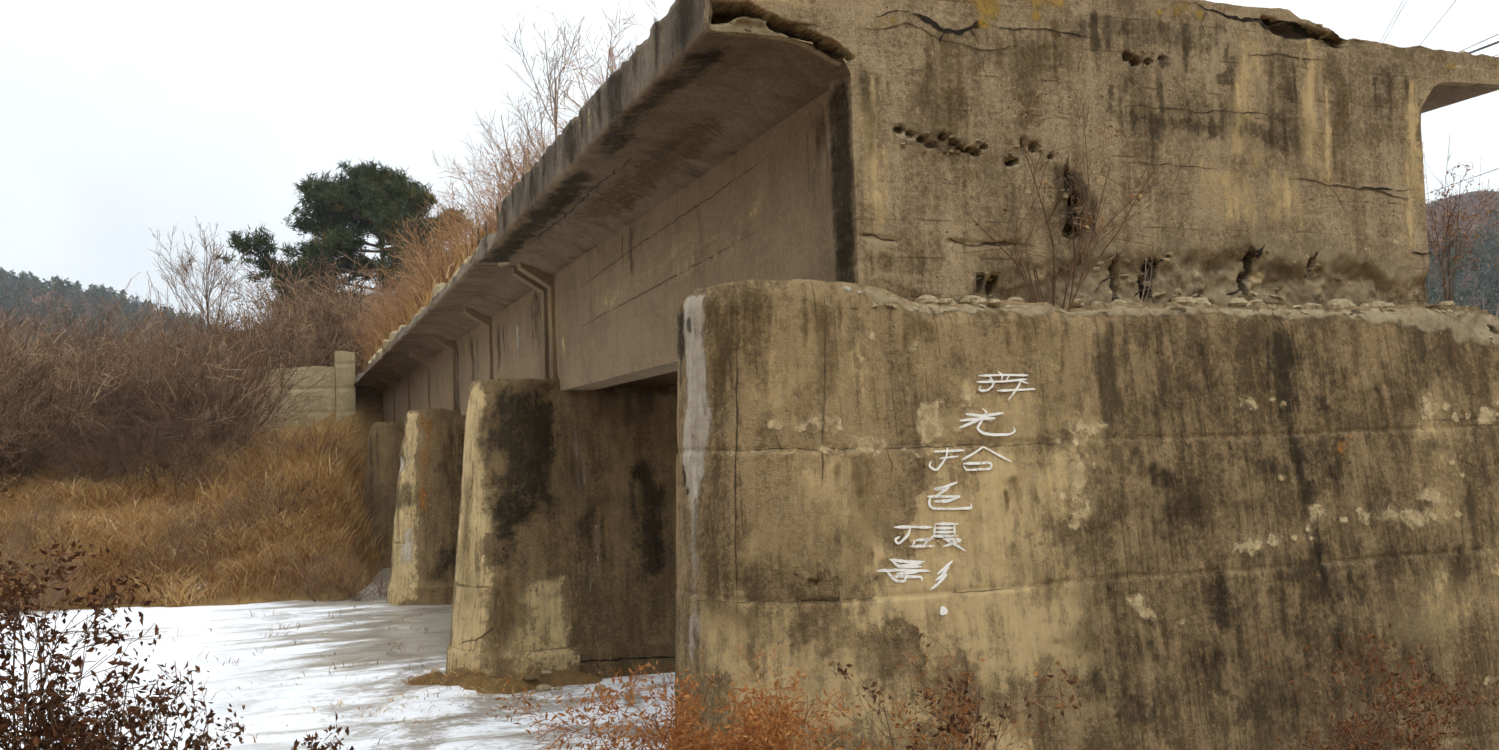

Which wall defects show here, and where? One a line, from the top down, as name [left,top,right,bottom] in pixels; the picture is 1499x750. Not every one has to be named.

crack [858,10,1092,81]
leakage [999,13,1194,76]
crack [1194,2,1359,73]
spalling [892,123,1110,239]
leakage [1108,27,1348,228]
leakage [1374,67,1425,259]
spalling [854,235,1499,346]
leakage [387,337,580,676]
leakage [630,459,671,583]
leakage [1224,328,1393,703]
leakage [1341,489,1499,653]
leakage [1191,576,1243,692]